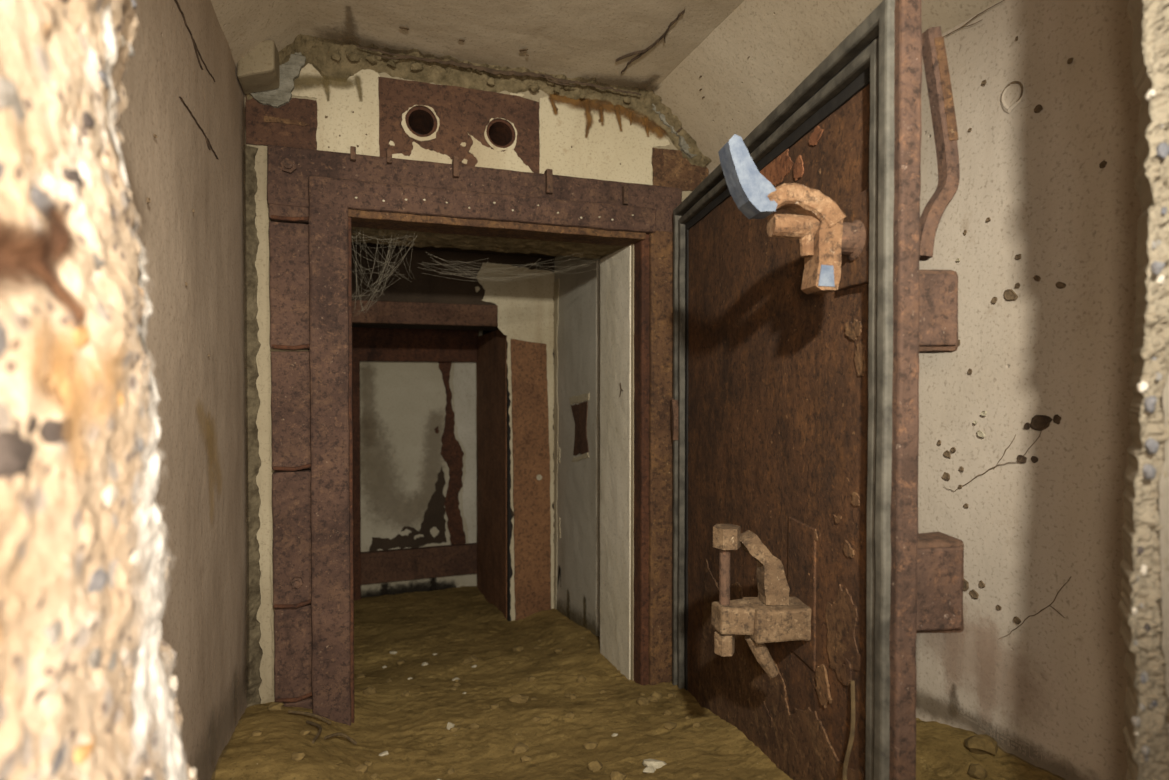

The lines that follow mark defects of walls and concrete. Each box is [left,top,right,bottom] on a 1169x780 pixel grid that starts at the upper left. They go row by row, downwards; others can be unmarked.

crack [174,0,215,82]
crack [615,8,685,74]
crack [179,97,219,160]
corrosion [760,126,824,186]
spalling [0,0,170,780]
spalling [244,34,712,707]
corrosion [845,319,866,376]
spalling [1118,0,1169,780]
crack [945,431,1042,492]
spalling [158,637,183,734]
corrosion [698,559,865,780]
spalling [182,749,197,780]